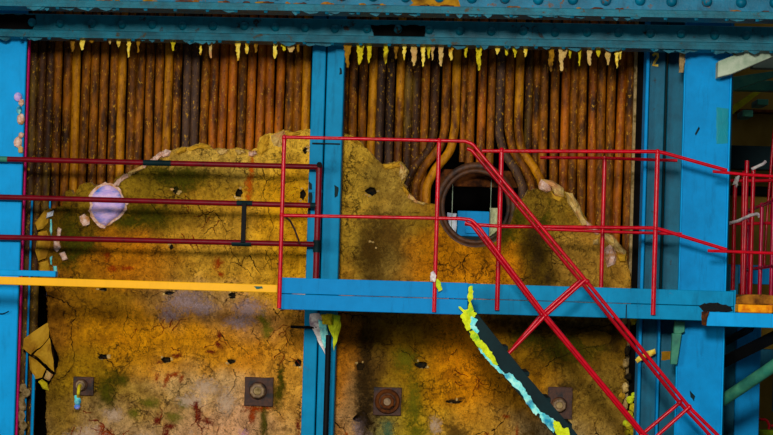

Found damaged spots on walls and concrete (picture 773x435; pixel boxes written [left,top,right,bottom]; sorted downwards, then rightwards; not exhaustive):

peeling [235,43,258,61]
peeling [339,45,372,75]
peeling [383,45,528,71]
peeling [542,47,622,72]
spalling [80,130,301,228]
spalling [538,179,626,267]
crack [32,294,76,380]
crack [123,305,186,351]
crack [204,308,302,366]
crack [71,353,132,435]
crack [189,369,239,434]
corrosion [242,406,274,423]